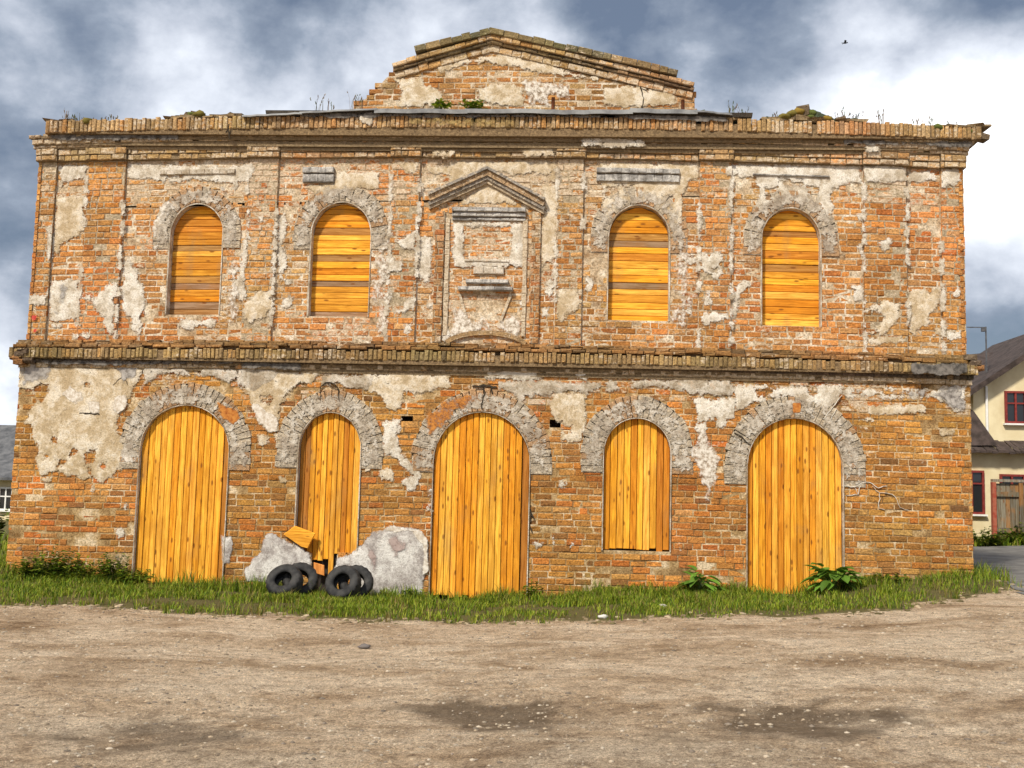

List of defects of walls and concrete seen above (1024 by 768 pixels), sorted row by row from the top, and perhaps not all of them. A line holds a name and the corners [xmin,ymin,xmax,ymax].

peeling [394,75,443,108]
peeling [438,54,676,108]
peeling [45,164,88,262]
peeling [29,219,147,341]
peeling [127,149,593,341]
peeling [725,163,961,253]
peeling [850,203,961,354]
peeling [17,367,967,512]
crack [844,482,906,510]